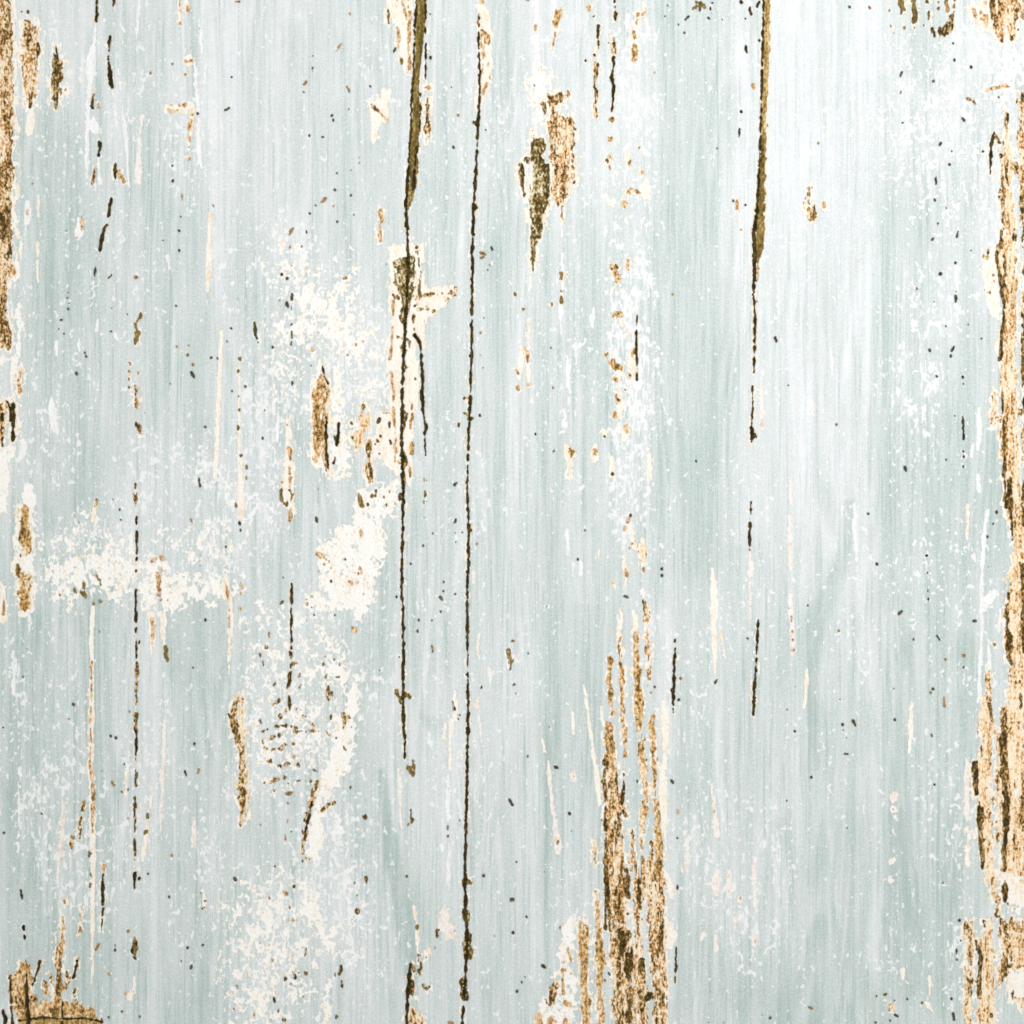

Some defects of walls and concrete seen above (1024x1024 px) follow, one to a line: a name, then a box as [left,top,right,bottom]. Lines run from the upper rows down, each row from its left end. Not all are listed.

peeling [0,0,462,1024]
crack [392,0,430,762]
crack [456,10,482,1024]
peeling [511,7,580,394]
peeling [534,513,679,1024]
crack [690,0,773,444]
peeling [864,0,1024,1024]